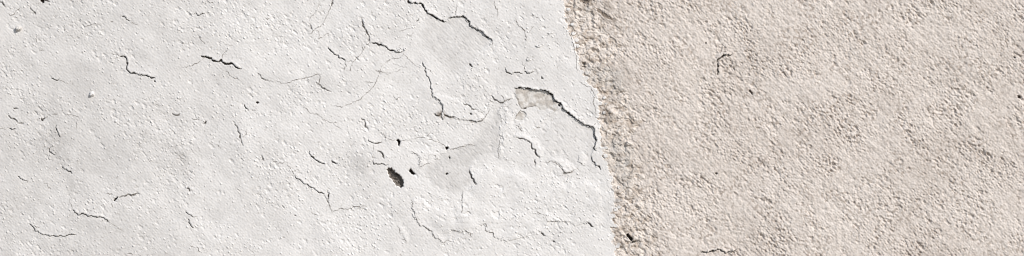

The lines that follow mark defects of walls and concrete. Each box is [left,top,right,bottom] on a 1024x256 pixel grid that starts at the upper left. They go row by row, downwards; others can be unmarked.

crack [0,108,141,256]
crack [113,54,156,82]
crack [262,151,362,216]
crack [182,0,602,173]
peeling [387,0,660,256]